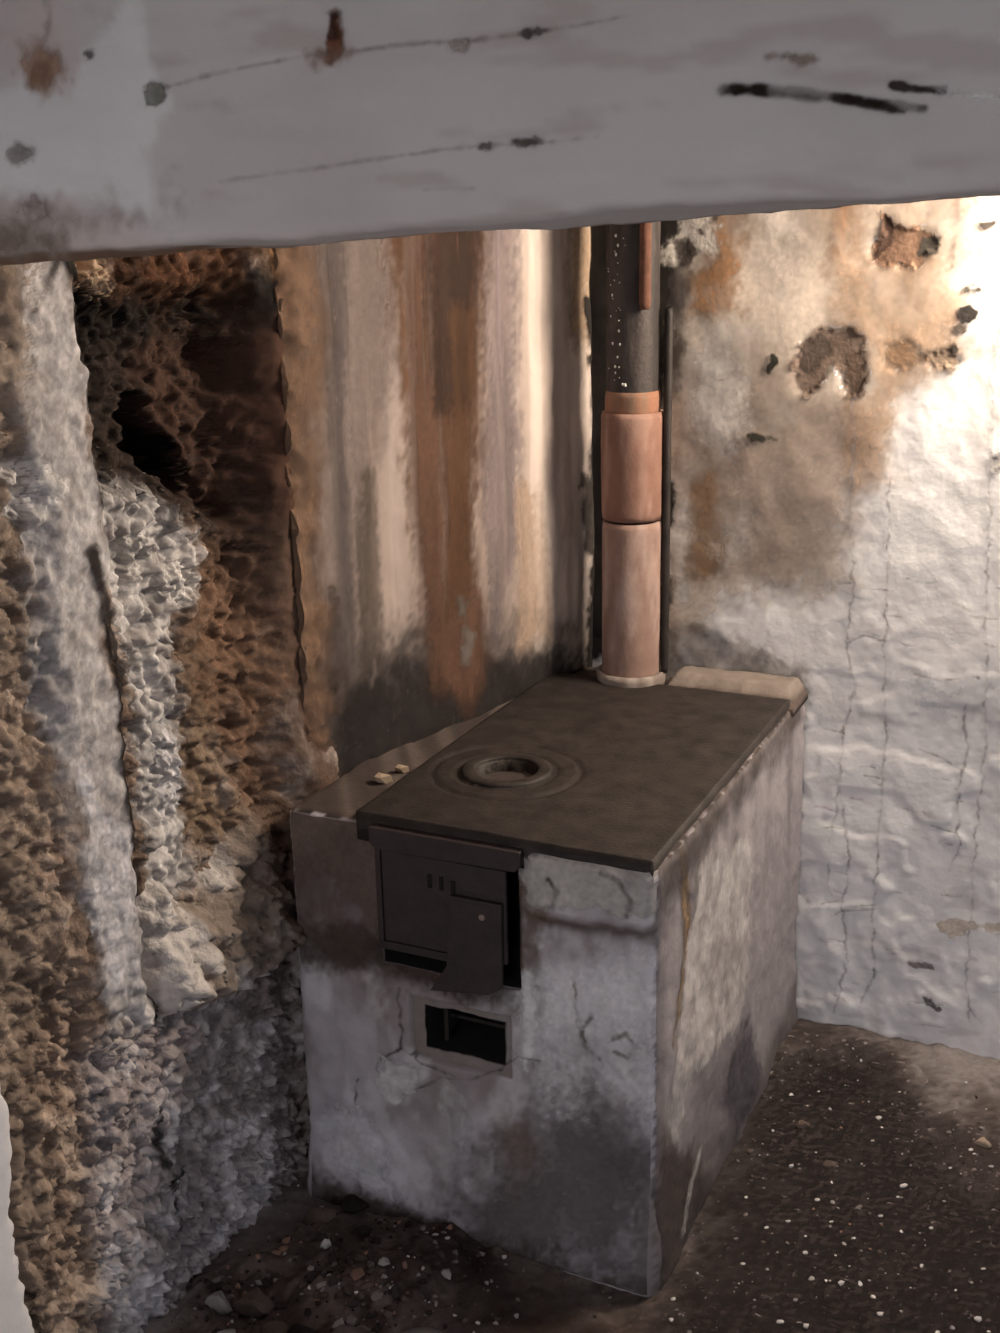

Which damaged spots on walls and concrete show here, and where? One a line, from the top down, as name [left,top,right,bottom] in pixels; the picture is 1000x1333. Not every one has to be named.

corrosion [316,11,343,64]
flaking render [873,211,941,270]
damp [428,231,481,607]
flaking render [766,325,869,400]
damp [669,196,988,635]
flaking render [887,284,983,373]
damp [273,243,381,753]
peeling [0,259,206,1036]
crack [846,571,897,669]
crack [934,701,987,831]
flaking render [937,919,1000,938]
flaking render [0,1037,55,1333]